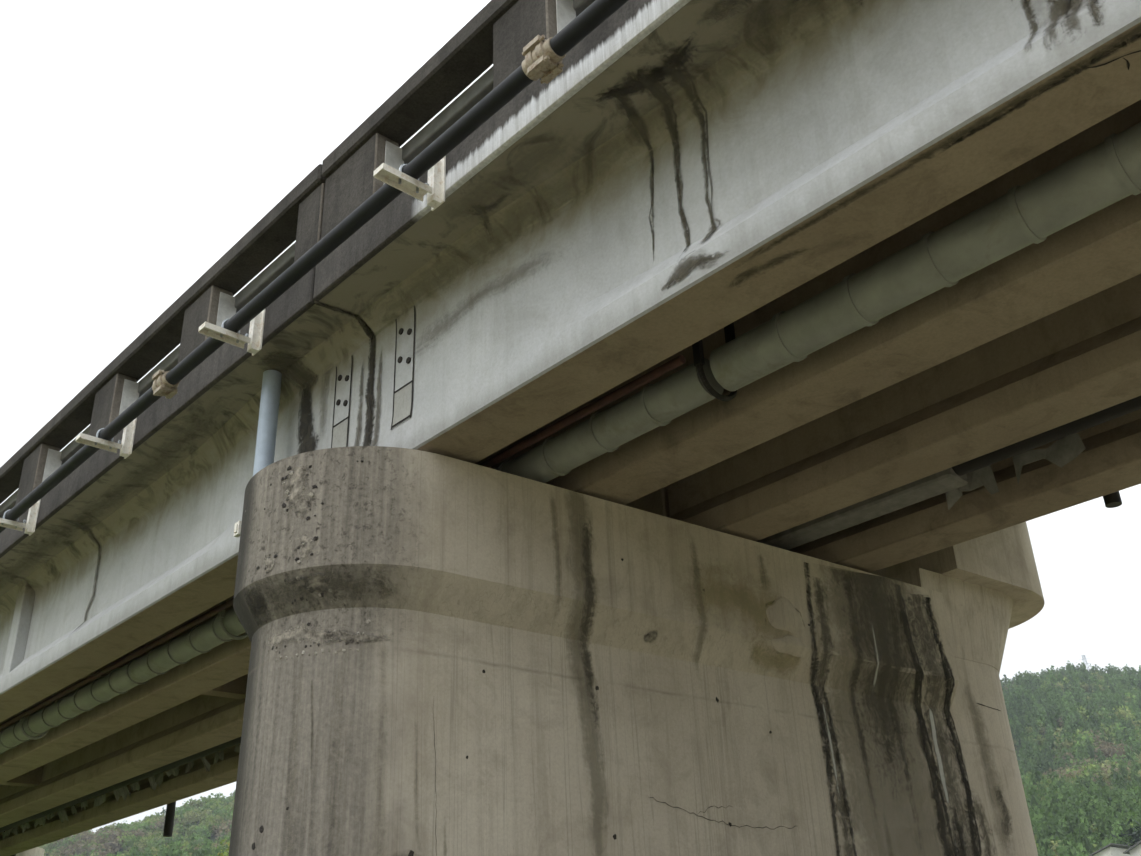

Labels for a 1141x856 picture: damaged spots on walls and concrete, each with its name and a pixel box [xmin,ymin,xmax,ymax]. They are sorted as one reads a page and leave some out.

damp [1022,0,1099,43]
damp [596,39,723,288]
damp [736,25,1141,285]
damp [581,528,594,698]
crack [650,797,795,829]
damp [804,562,857,856]
damp [842,572,991,856]